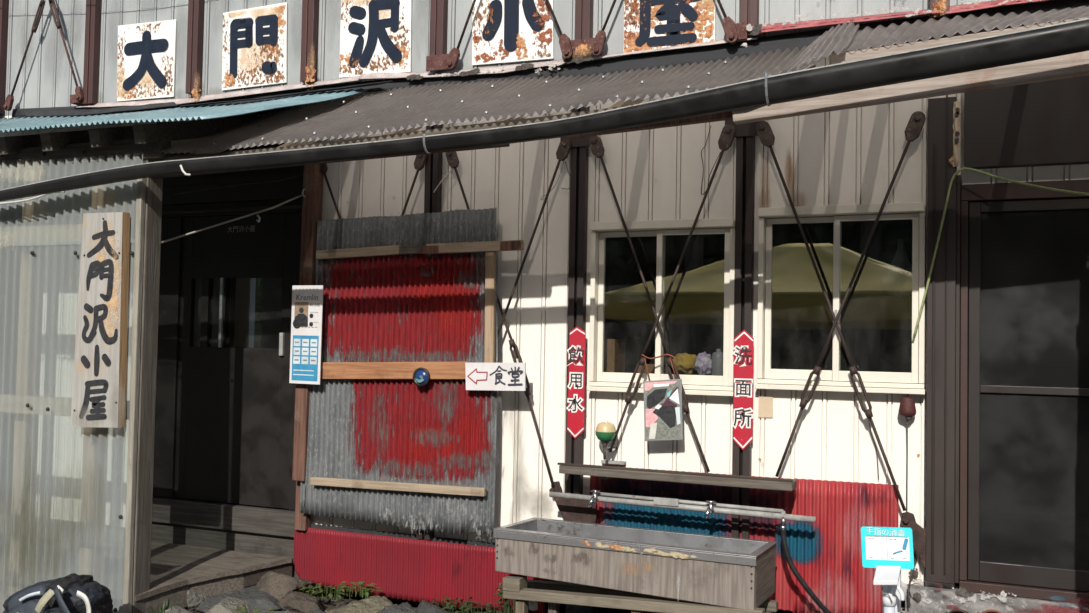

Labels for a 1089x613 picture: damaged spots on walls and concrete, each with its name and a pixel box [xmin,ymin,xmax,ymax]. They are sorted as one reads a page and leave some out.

corrosion [117,22,173,99]
corrosion [222,5,286,88]
corrosion [339,0,410,76]
corrosion [472,0,552,63]
corrosion [624,0,715,55]
corrosion [932,0,947,16]
peeling [345,349,447,362]
peeling [412,381,464,446]
peeling [373,451,498,477]